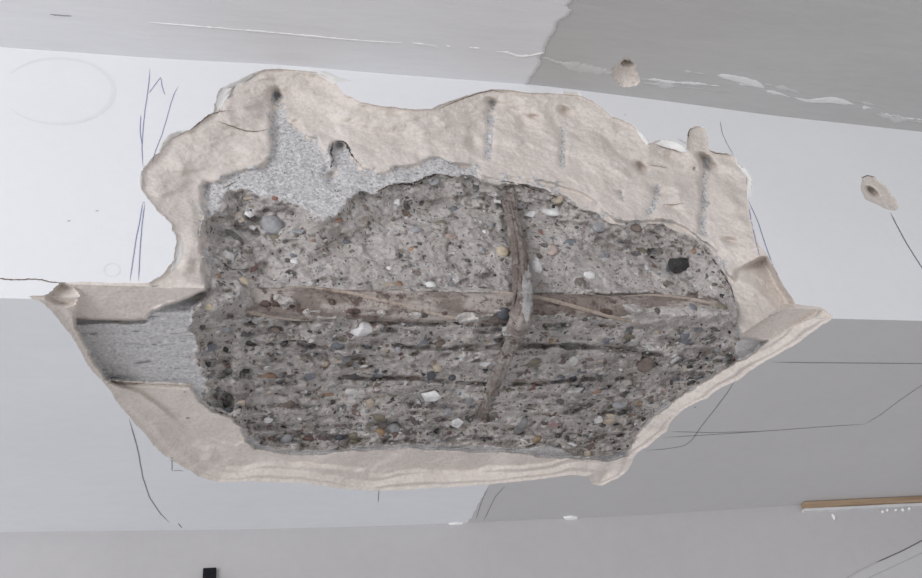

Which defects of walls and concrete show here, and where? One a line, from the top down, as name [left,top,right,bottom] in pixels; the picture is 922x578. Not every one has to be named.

spalling [0,0,833,491]
peeling [795,97,855,105]